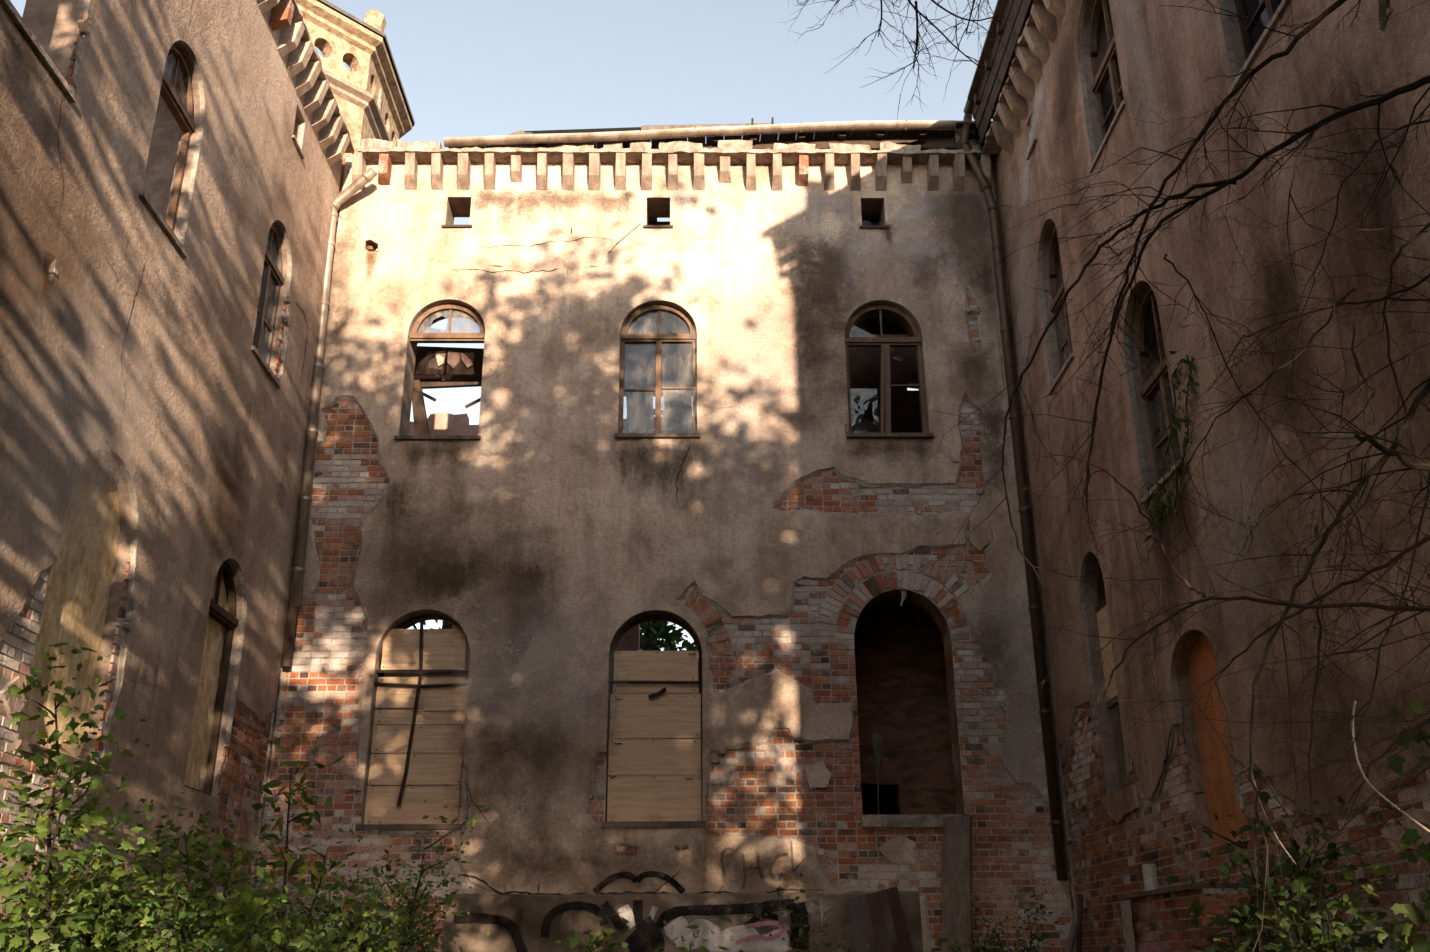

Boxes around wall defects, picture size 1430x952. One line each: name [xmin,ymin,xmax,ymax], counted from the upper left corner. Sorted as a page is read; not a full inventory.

crack [453,223,642,274]
water stain [789,186,987,367]
flaking render [0,539,136,867]
flaking render [207,395,494,952]
water stain [383,526,545,652]
flaking render [676,393,1430,952]